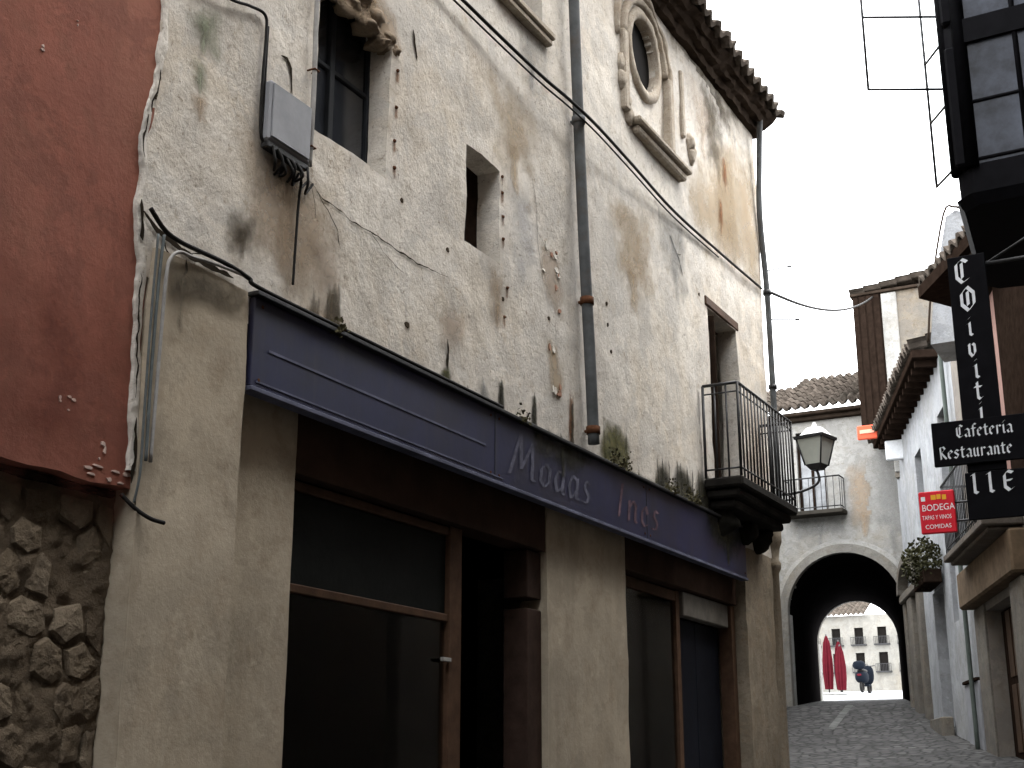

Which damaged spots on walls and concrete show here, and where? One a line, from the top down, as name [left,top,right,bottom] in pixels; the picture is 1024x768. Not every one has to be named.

water stain [232,167,320,267]
crack [309,182,448,277]
water stain [442,339,451,379]
peeling [84,441,131,485]
water stain [656,460,713,511]